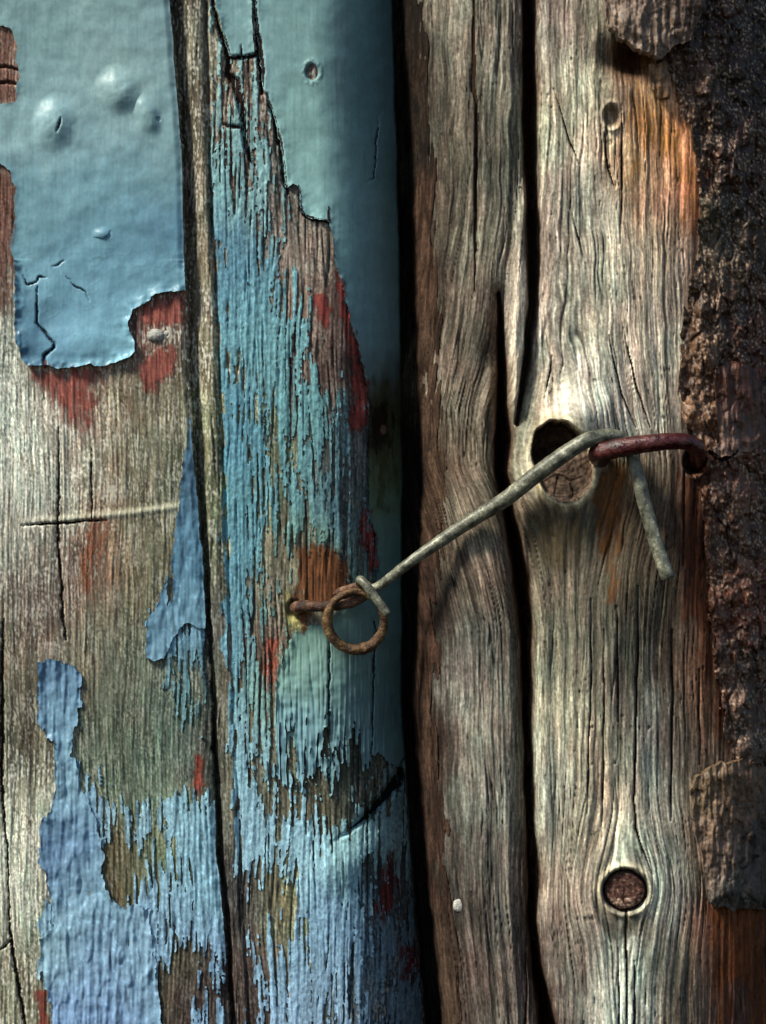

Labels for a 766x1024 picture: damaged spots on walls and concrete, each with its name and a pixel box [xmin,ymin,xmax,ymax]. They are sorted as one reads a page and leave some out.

crack [211,0,331,223]
crack [25,262,85,368]
crack [25,431,101,641]
peeling [36,0,422,1024]
rust [293,543,352,634]